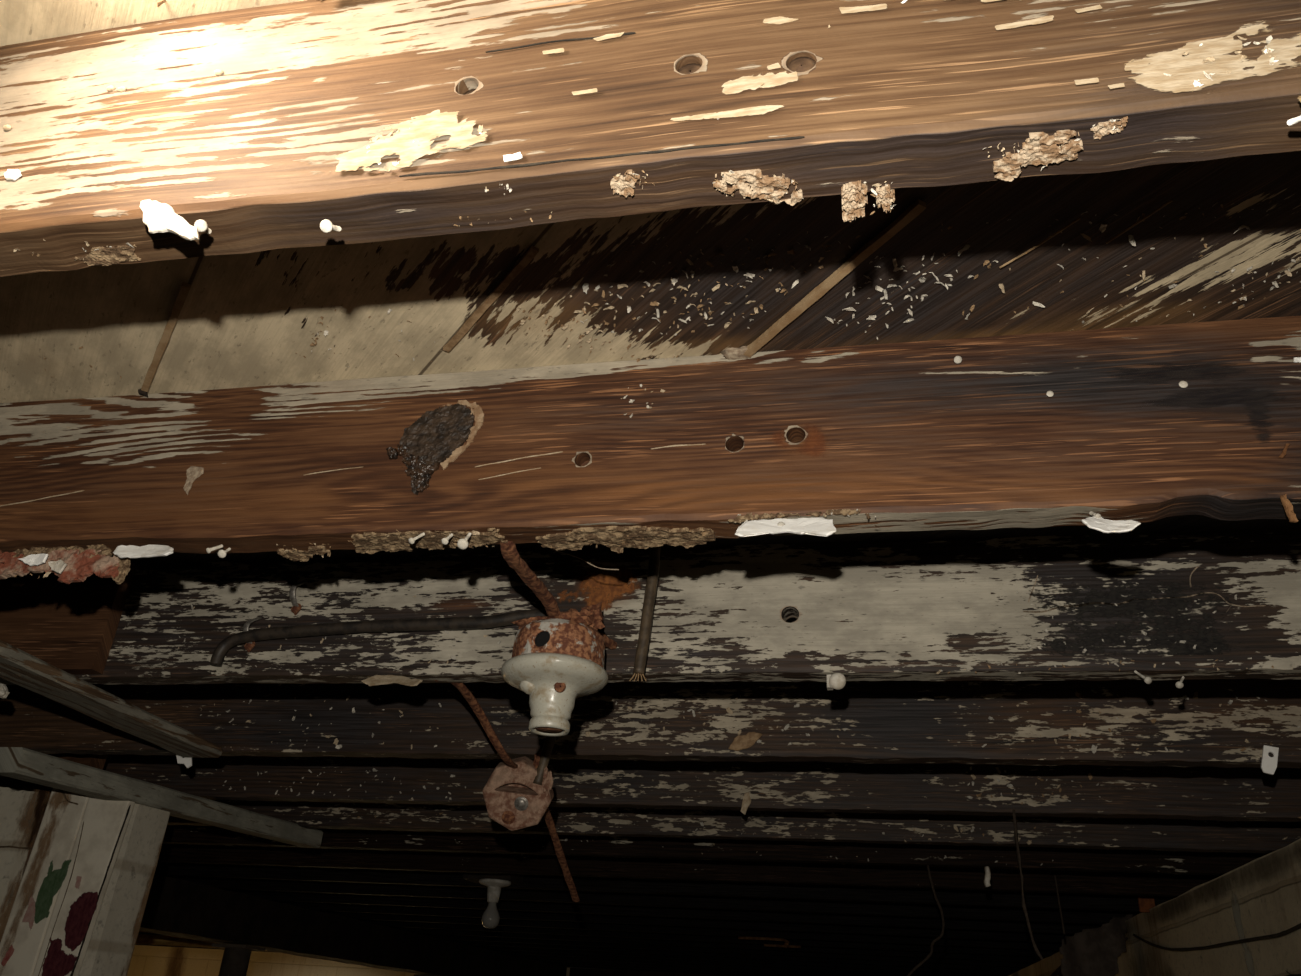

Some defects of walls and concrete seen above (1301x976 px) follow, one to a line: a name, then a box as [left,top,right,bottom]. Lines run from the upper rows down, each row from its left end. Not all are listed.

peeling [1074,21,1301,93]
peeling [670,63,798,121]
peeling [325,109,488,172]
peeling [984,116,1128,181]
peeling [140,199,199,240]
peeling [713,169,803,206]
peeling [841,180,895,222]
peeling [113,545,174,558]
peeling [536,526,716,553]
peeling [727,509,877,537]
peeling [1082,516,1141,533]
corrosion [511,565,641,630]